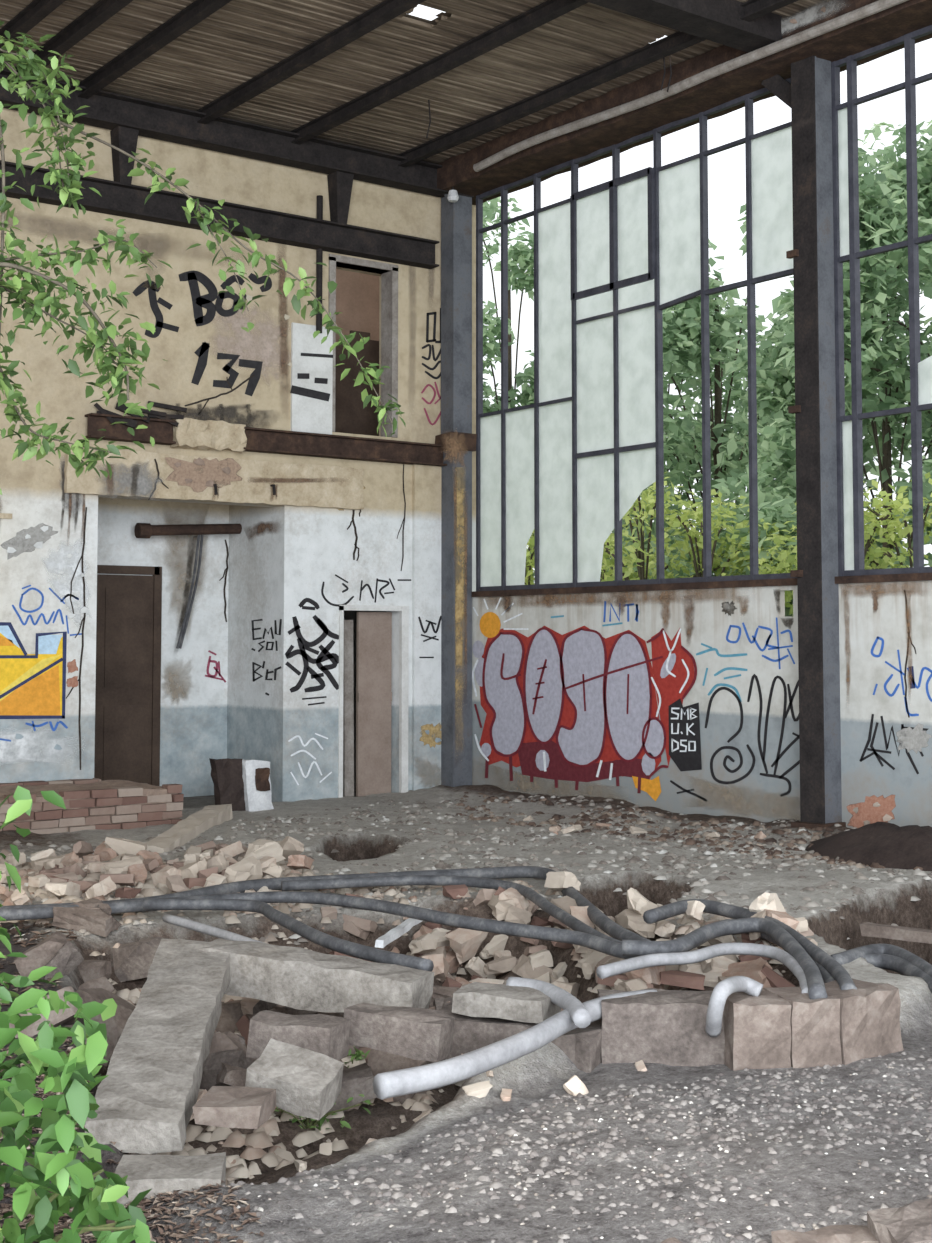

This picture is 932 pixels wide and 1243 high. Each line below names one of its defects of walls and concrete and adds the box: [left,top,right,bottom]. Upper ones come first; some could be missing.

spalling [165,418,247,493]
rust [444,434,466,463]
damp [169,520,202,629]
rust [454,479,467,693]